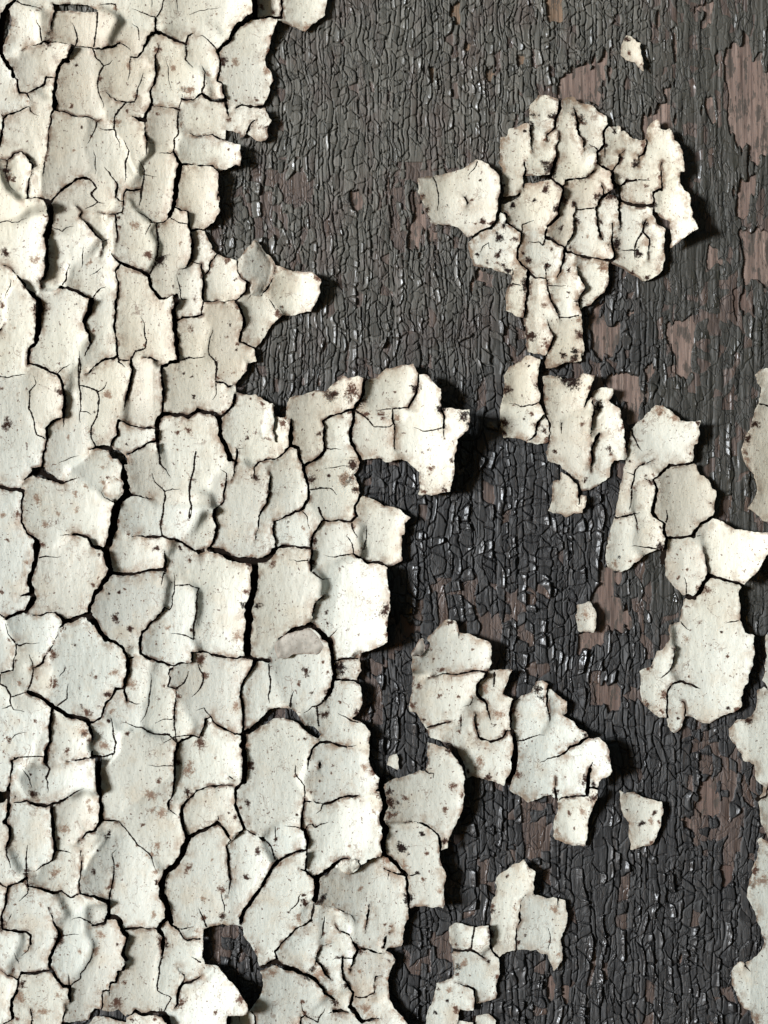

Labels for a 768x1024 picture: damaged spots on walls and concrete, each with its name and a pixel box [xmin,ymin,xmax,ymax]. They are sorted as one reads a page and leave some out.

peeling [694,1,714,29]
crack [480,101,663,356]
crack [0,0,445,1024]
peeling [0,0,612,1024]
peeling [407,32,768,1024]
crack [615,429,742,630]
crack [412,655,597,801]
crack [661,652,700,718]
crack [458,983,476,1024]